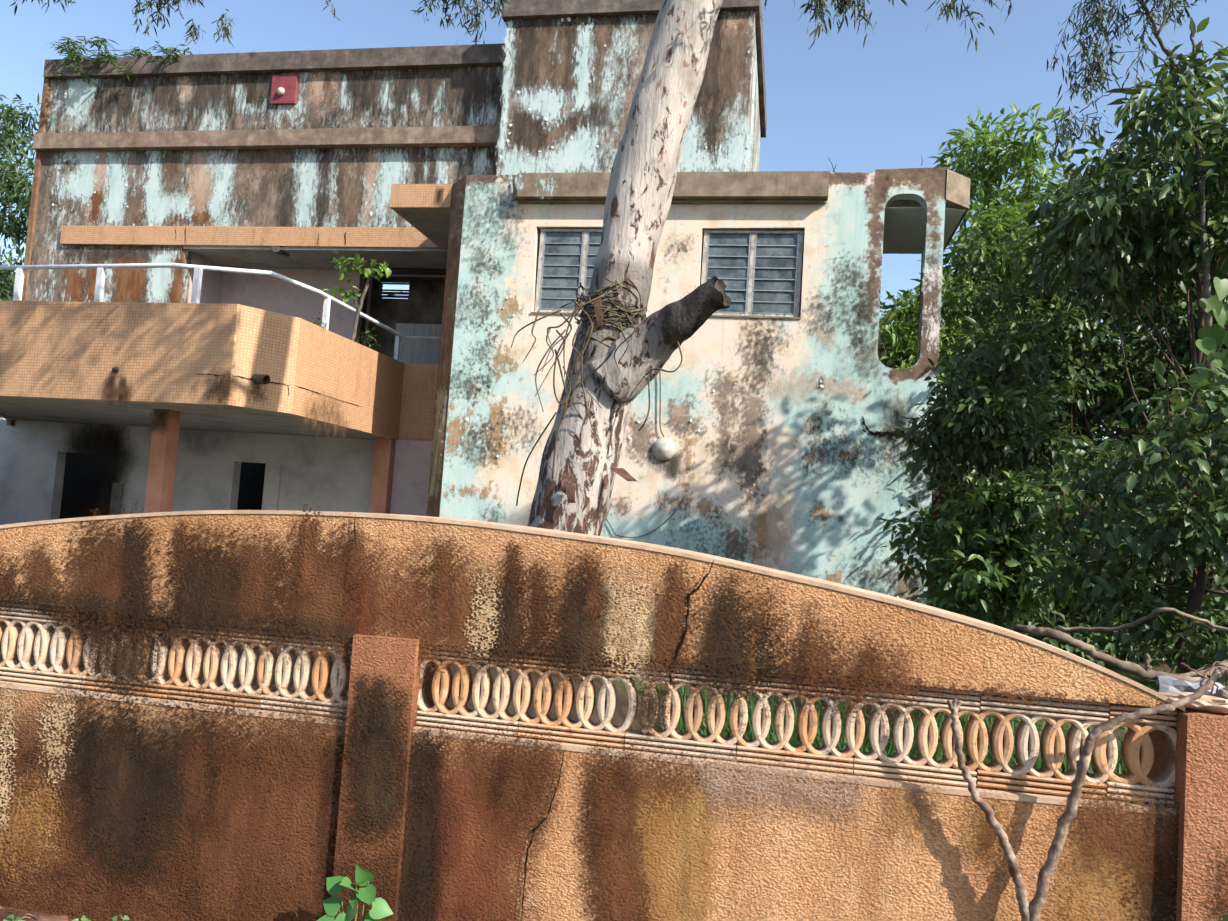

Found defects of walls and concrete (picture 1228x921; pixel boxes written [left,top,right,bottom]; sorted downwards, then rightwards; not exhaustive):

water stain [57,73,273,133]
water stain [309,148,335,227]
peeling [498,291,525,327]
peeling [922,265,943,351]
peeling [428,340,518,503]
peeling [610,497,630,515]
peeling [626,371,863,565]
crack [669,560,714,686]
water stain [414,512,1172,720]
water stain [0,506,448,921]
crack [521,750,564,920]
water stain [574,741,868,921]